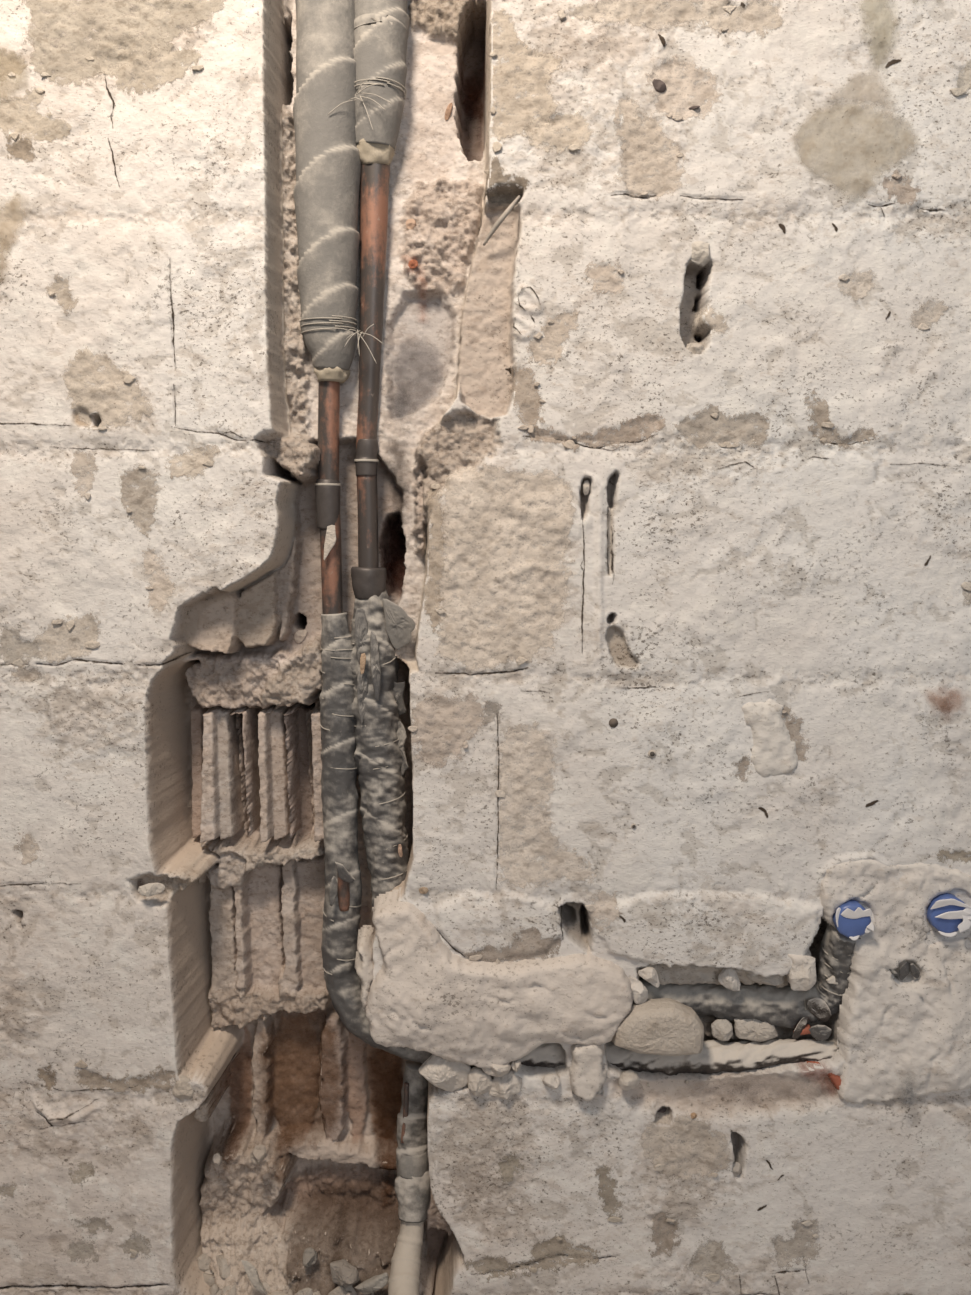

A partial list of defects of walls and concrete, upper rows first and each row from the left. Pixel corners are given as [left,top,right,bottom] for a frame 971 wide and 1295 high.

flaking render [0,0,226,163]
crack [105,78,120,187]
flaking render [883,169,922,205]
crack [169,275,268,443]
flaking render [60,348,152,431]
crack [0,423,149,451]
flaking render [120,445,220,613]
crack [0,652,191,666]
flaking render [467,927,562,963]
crack [0,1282,168,1290]
crack [739,1257,809,1295]